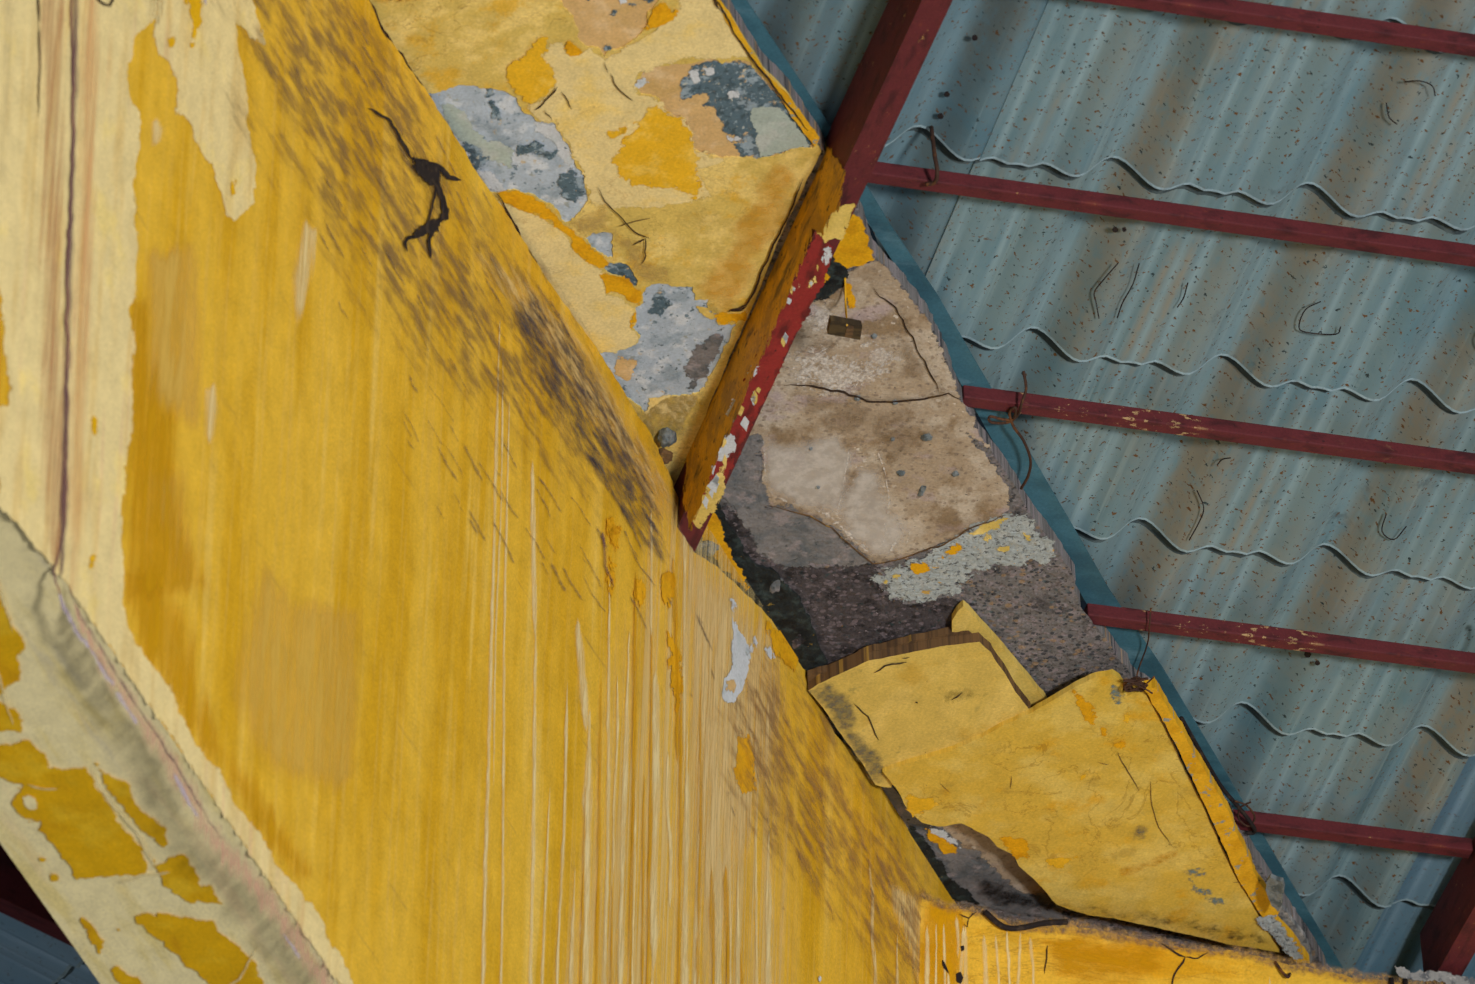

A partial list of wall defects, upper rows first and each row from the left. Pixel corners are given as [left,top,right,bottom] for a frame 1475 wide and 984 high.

crack [369,0,432,98]
crack [368,108,461,258]
crack [497,194,538,264]
peeling [0,0,353,984]
leakage [44,0,328,984]
spalling [370,0,1129,917]
leakage [437,393,771,984]
mould [820,685,883,775]
leakage [869,869,890,984]